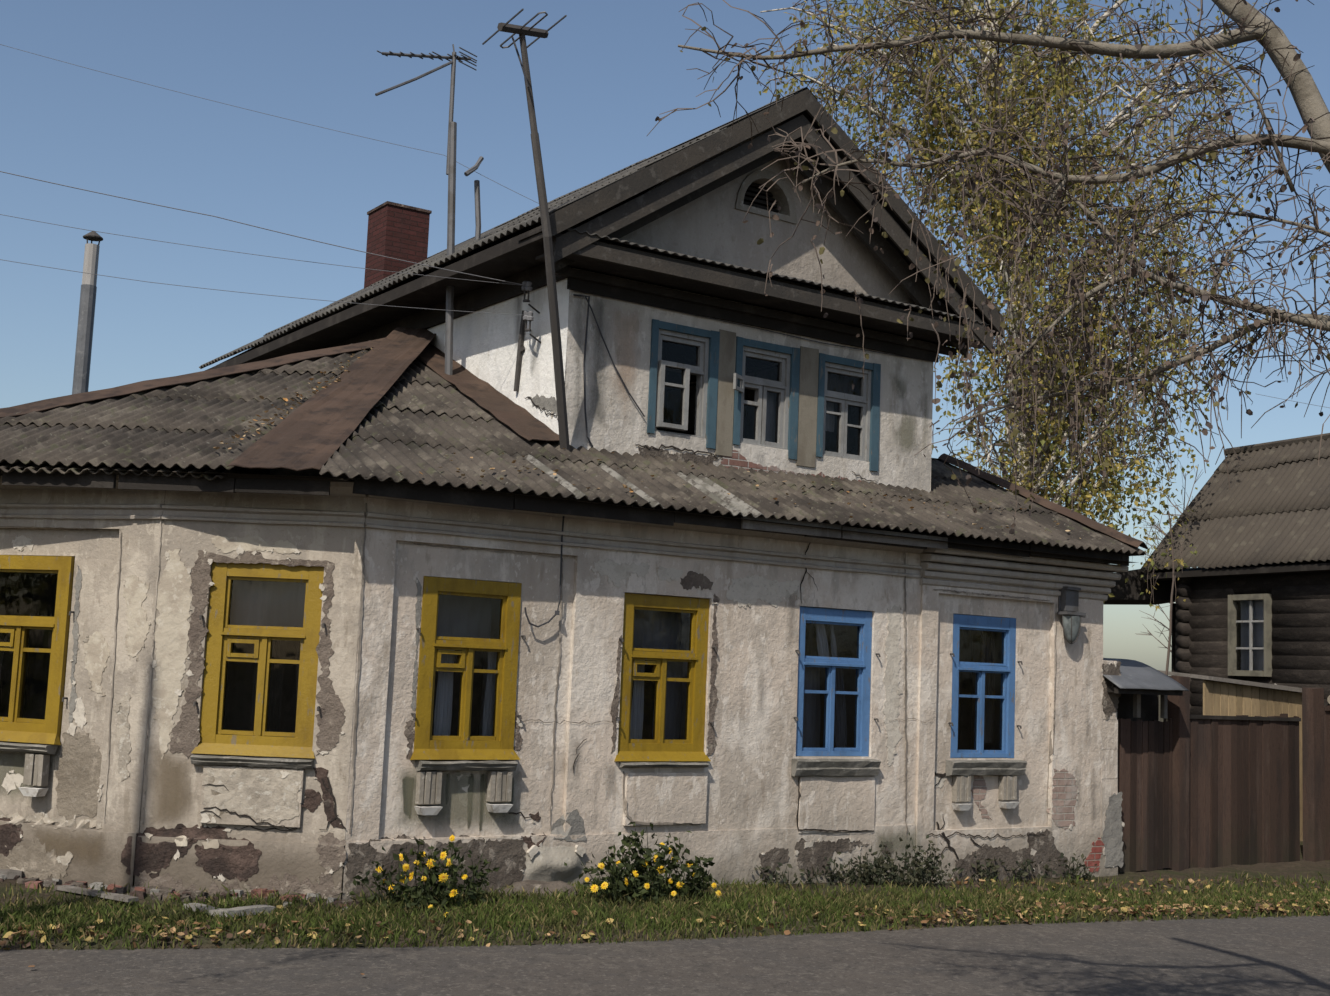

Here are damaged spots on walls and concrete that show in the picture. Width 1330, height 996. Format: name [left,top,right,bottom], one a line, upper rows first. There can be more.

spalling [0,565,132,880]
crack [200,503,368,834]
spalling [121,535,579,900]
spalling [759,838,894,882]
crack [893,552,1057,861]
spalling [953,769,1125,882]